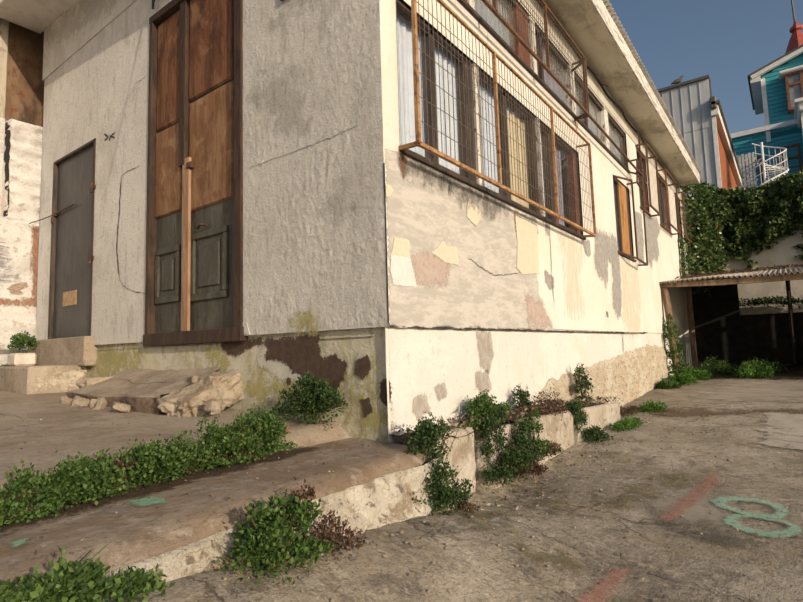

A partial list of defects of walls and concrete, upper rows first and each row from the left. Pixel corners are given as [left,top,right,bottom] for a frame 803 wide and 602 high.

flaking render [385,149,554,394]
flaking render [0,282,37,307]
peeling [221,322,371,389]
peeling [380,378,392,406]
flaking render [435,383,447,400]
peeling [360,398,373,417]
flaking render [413,395,430,418]